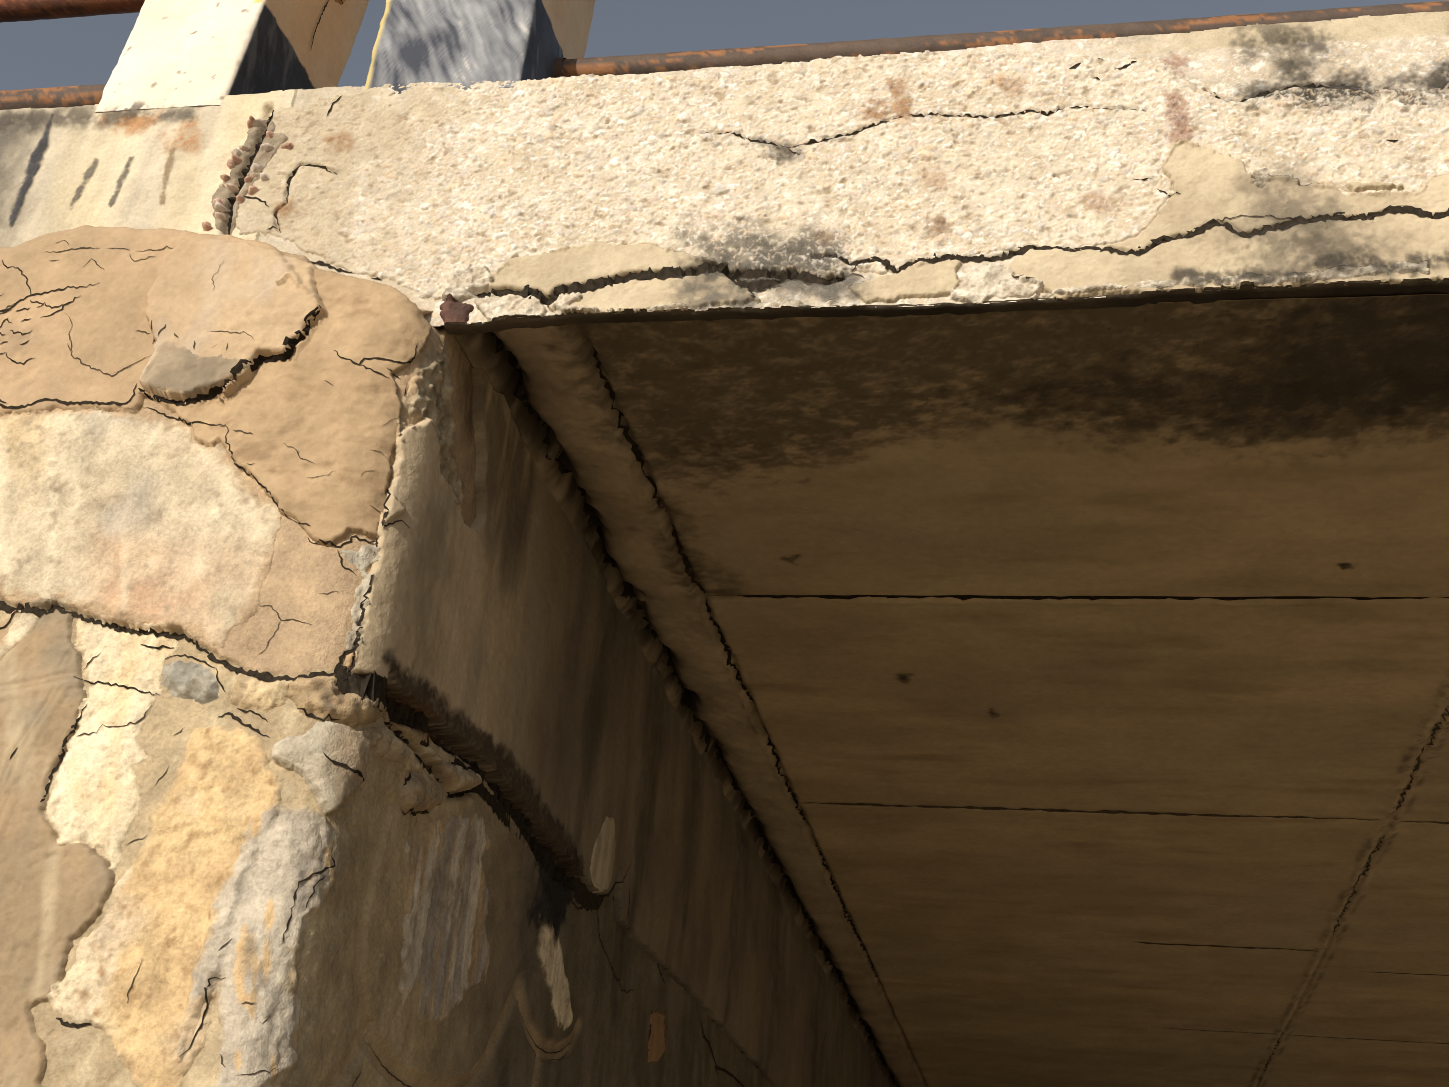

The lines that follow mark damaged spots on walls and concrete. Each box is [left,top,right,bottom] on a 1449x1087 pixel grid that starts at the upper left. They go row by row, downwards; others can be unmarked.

crack [211,110,336,289]
spalling [236,50,1449,326]
crack [701,58,1146,155]
crack [477,205,1449,307]
crack [1210,83,1342,102]
spalling [395,331,466,513]
flaking render [0,221,372,1087]
crack [0,240,665,993]
flaking render [341,544,381,669]
spalling [398,809,491,1029]
spalling [536,914,575,1031]
crack [700,1019,744,1087]